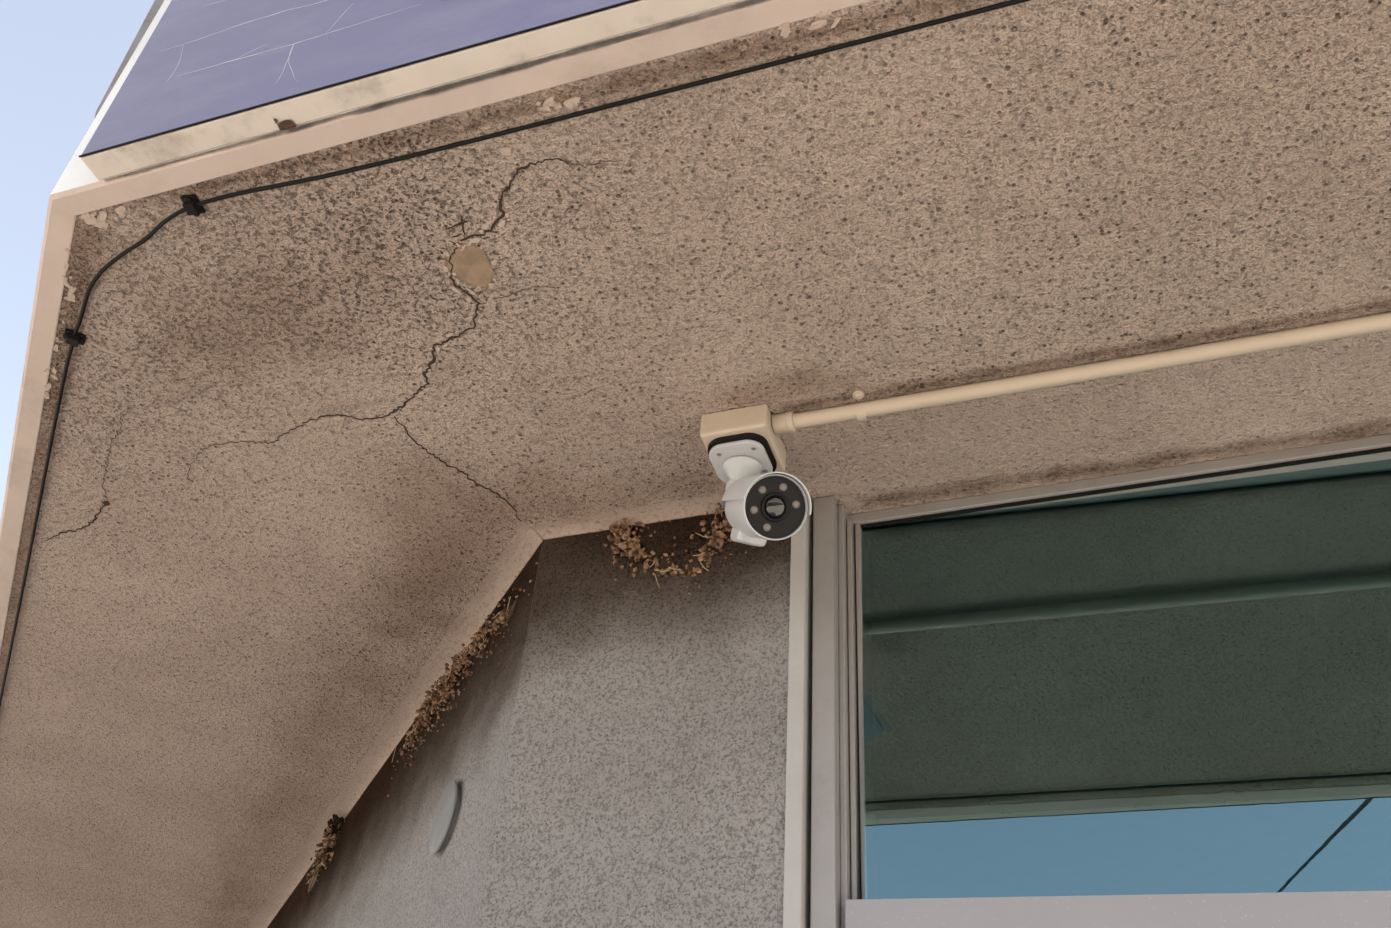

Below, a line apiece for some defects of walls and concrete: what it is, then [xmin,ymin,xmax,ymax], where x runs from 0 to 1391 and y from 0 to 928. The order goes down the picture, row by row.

crack [44,408,133,542]
crack [187,158,622,521]